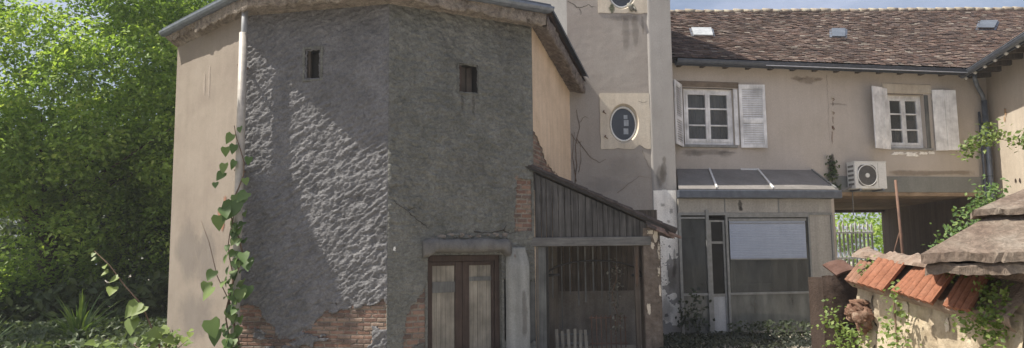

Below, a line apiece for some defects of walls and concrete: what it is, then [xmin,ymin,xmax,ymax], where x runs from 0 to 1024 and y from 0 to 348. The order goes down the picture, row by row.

flaking render [433,131,558,240]
peeling [647,190,682,325]
flaking render [239,299,387,348]
flaking render [403,289,425,348]